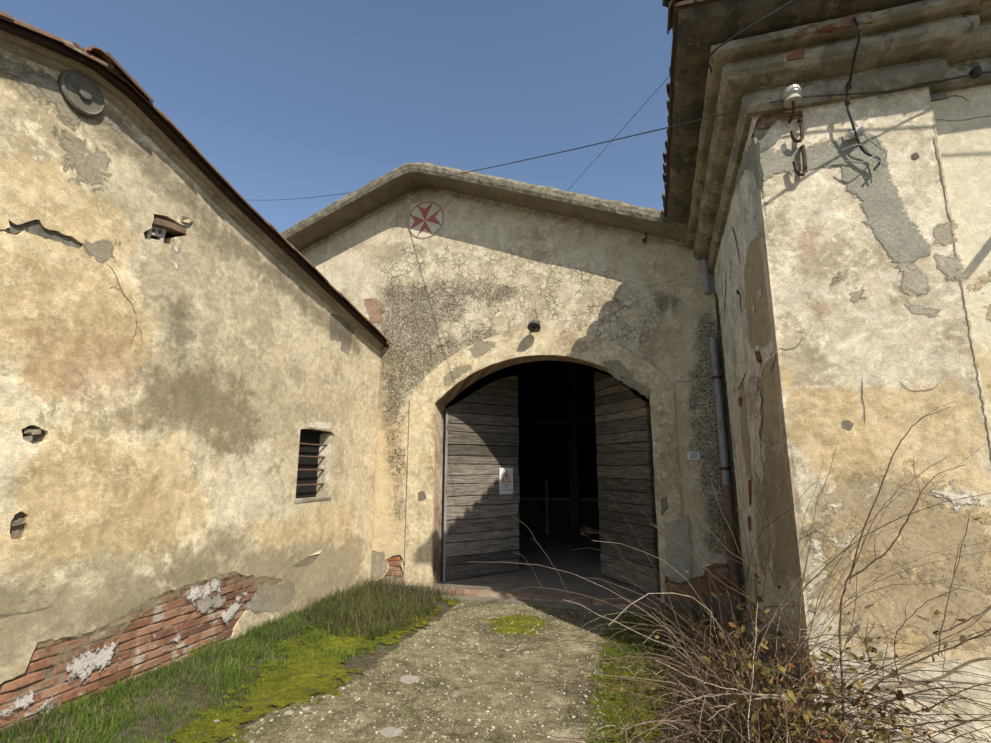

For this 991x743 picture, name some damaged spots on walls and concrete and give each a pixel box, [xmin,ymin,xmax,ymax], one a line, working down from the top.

crack [933,95,983,257]
crack [105,262,142,342]
peeling [849,286,866,304]
spalling [22,425,45,444]
leakage [379,281,516,520]
crack [960,280,991,459]
spalling [10,512,26,540]
spalling [293,550,322,567]
spalling [660,496,732,606]
spalling [0,571,295,732]